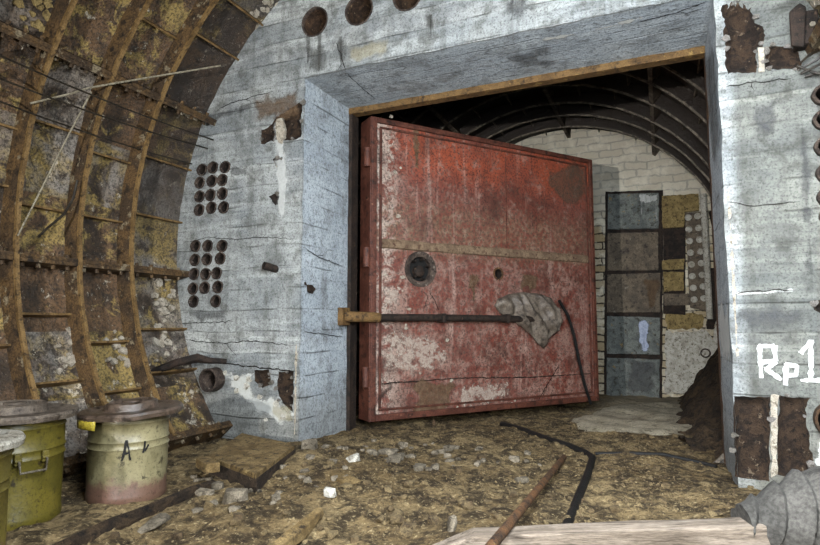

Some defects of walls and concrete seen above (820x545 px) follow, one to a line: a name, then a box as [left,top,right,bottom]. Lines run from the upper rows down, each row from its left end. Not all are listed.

spalling [721,0,802,74]
spalling [259,99,306,144]
peeling [223,344,298,434]
spalling [729,394,815,481]